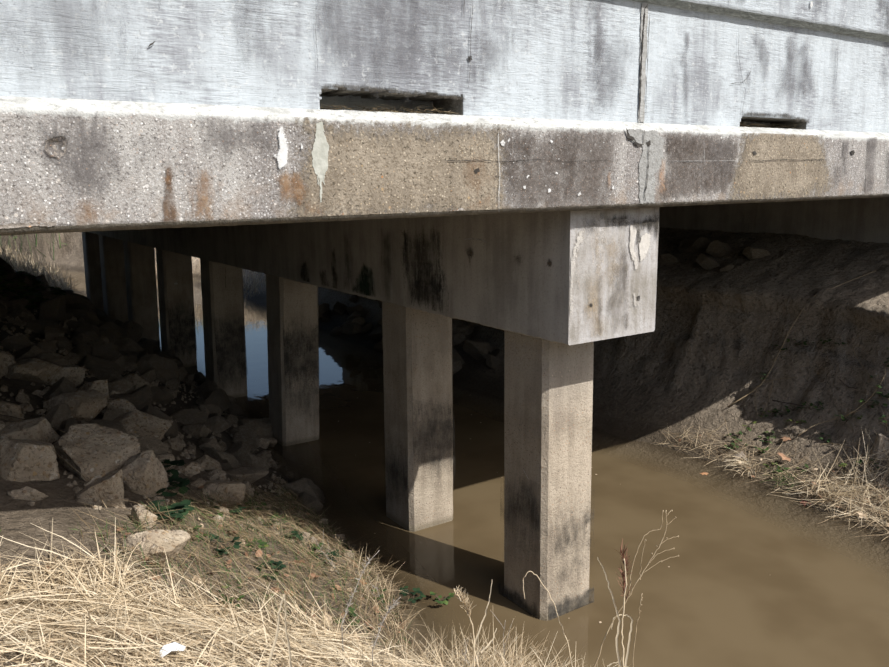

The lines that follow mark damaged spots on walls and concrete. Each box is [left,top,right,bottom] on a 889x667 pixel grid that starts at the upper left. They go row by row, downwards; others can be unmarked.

crack [626,4,651,201]
peeling [274,117,514,217]
rust [163,168,177,221]
water stain [509,488,539,529]
water stain [498,585,537,617]
water stain [549,588,594,620]